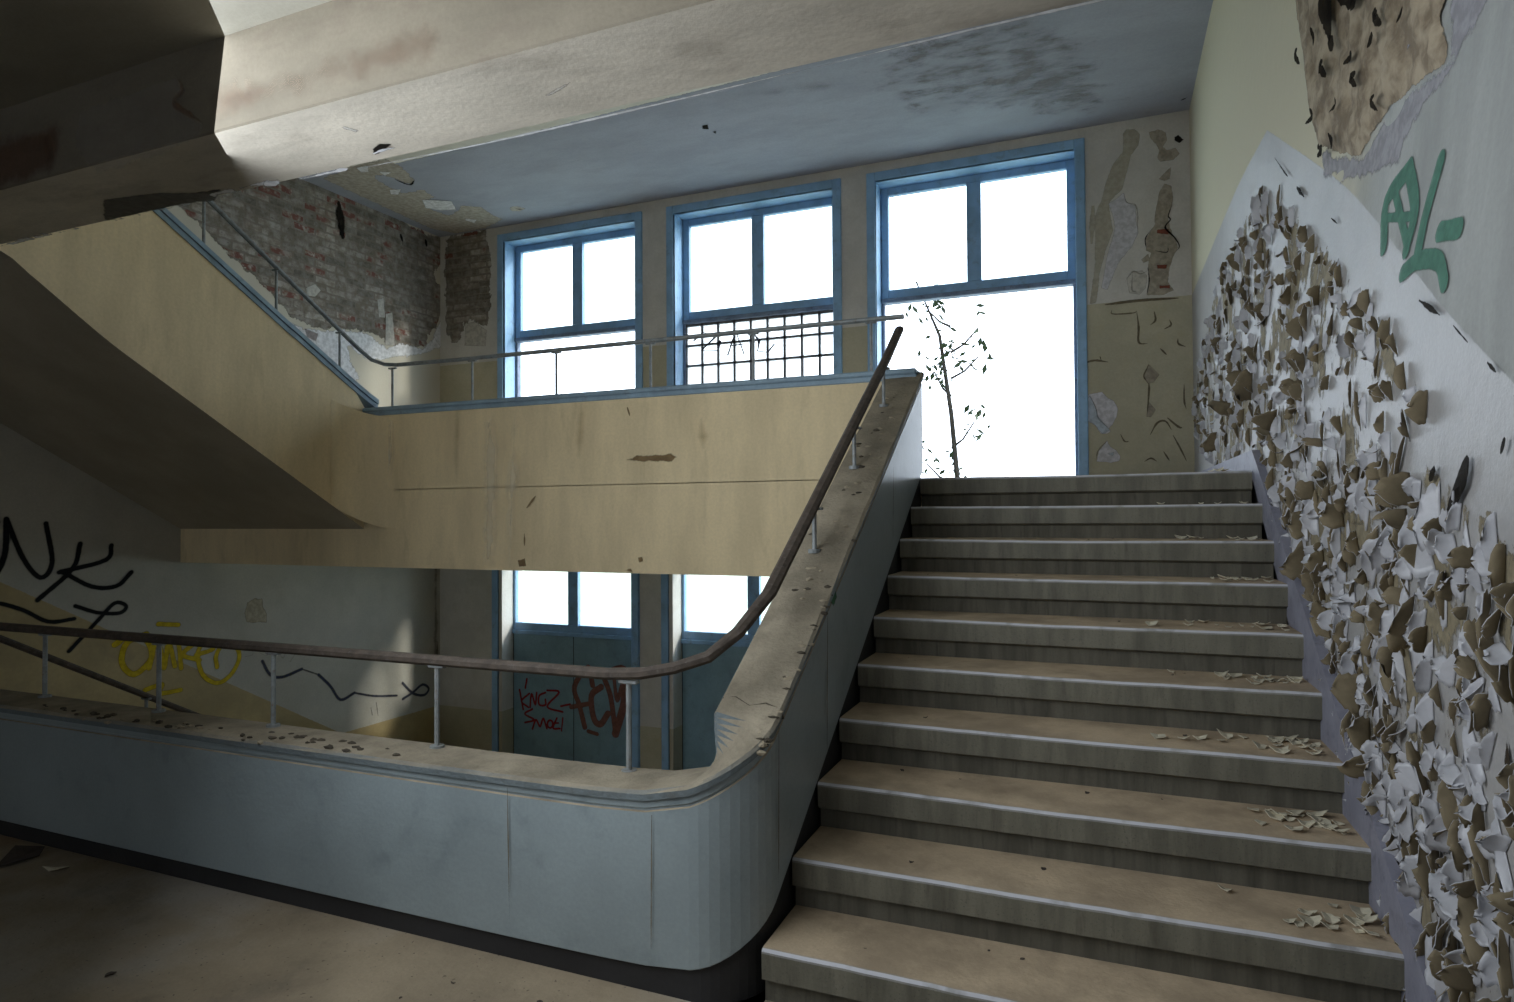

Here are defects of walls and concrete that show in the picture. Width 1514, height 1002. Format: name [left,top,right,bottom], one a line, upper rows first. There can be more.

spalling [818,0,1105,67]
water stain [897,35,1098,107]
flaking render [1294,0,1487,181]
flaking render [159,72,794,380]
flaking render [1127,130,1183,295]
peeling [1088,392,1120,463]
peeling [1191,160,1514,1002]
spalling [756,710,784,756]